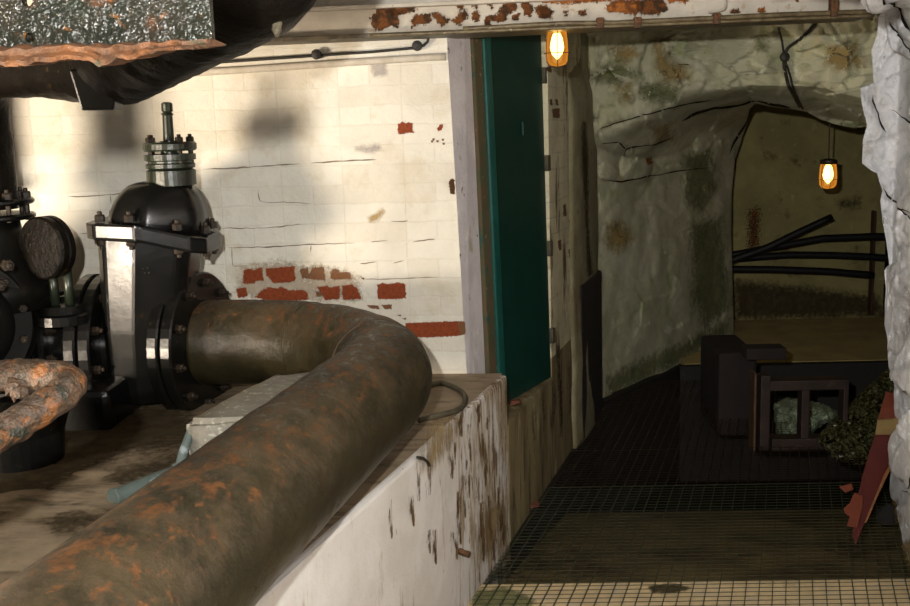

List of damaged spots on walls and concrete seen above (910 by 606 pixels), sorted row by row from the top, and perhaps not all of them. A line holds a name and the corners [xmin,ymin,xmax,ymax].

corrosion [369,0,688,31]
crack [882,0,910,52]
peeling [397,122,414,134]
crack [599,100,790,157]
crack [872,97,910,132]
crack [608,167,710,183]
crack [883,188,910,219]
peeling [237,266,466,338]
water stain [606,220,884,395]
water stain [424,419,458,472]